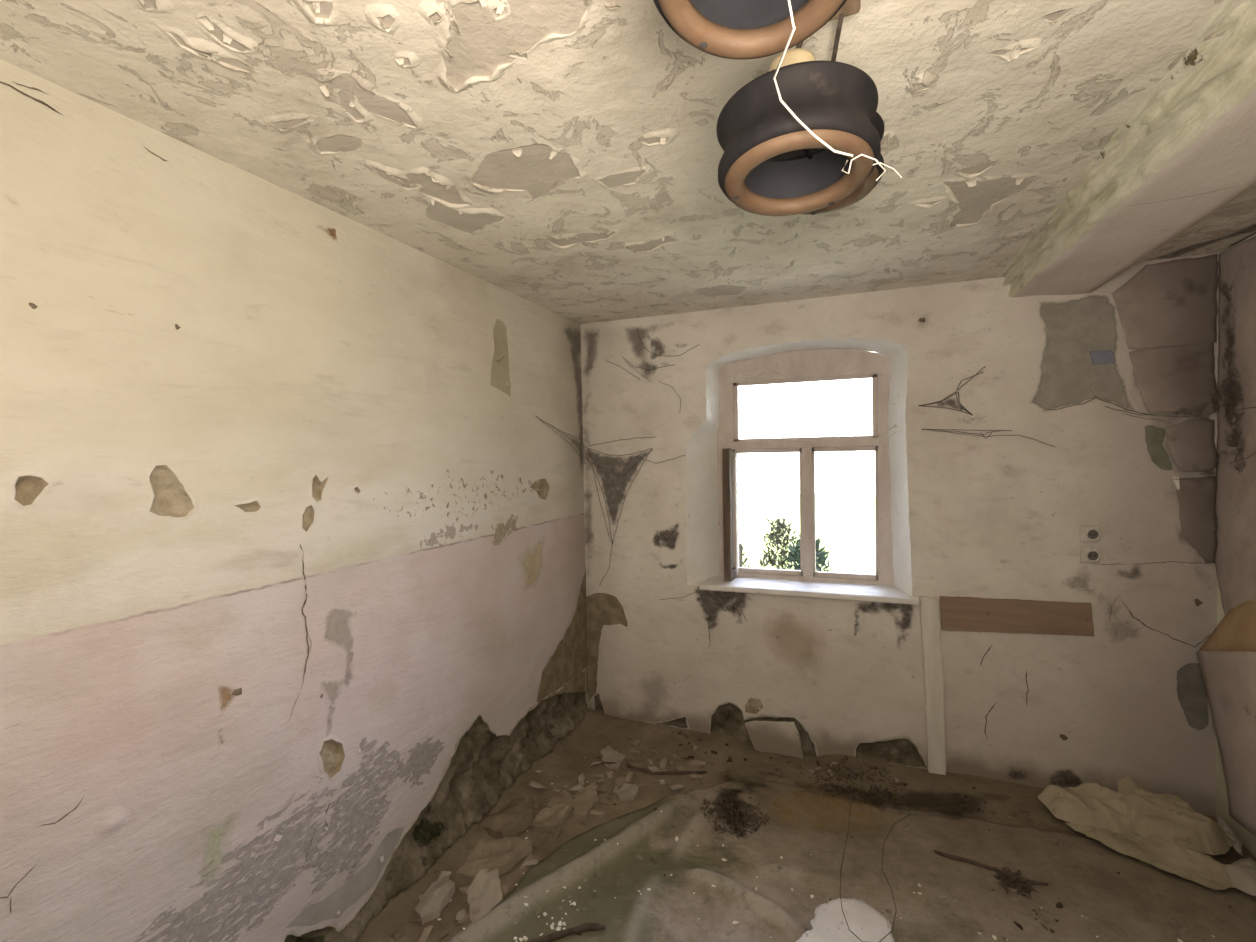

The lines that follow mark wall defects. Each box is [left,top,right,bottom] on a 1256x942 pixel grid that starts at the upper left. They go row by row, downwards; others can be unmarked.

peeling [132,0,263,76]
peeling [394,0,621,93]
peeling [262,68,652,234]
peeling [1026,291,1180,490]
spalling [4,471,56,509]
spalling [144,462,199,520]
spalling [298,472,330,533]
crack [289,545,311,721]
damp [696,590,746,628]
damp [859,602,912,638]
crack [1109,598,1210,647]
spalling [135,668,607,942]